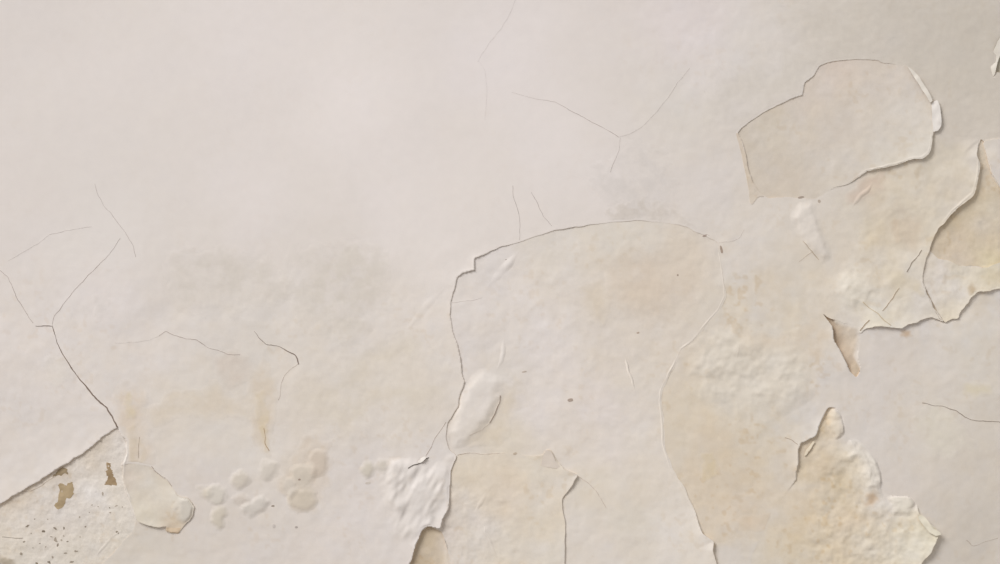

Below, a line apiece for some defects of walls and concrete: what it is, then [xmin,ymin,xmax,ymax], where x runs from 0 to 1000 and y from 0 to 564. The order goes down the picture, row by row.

crack [512,68,690,172]
peeling [736,59,1000,333]
crack [0,185,171,486]
flaking render [0,428,194,564]
crack [126,331,240,355]
crack [254,331,299,400]
crack [458,396,501,455]
peeling [410,220,727,564]
peeling [753,407,941,564]
crack [922,402,1000,422]